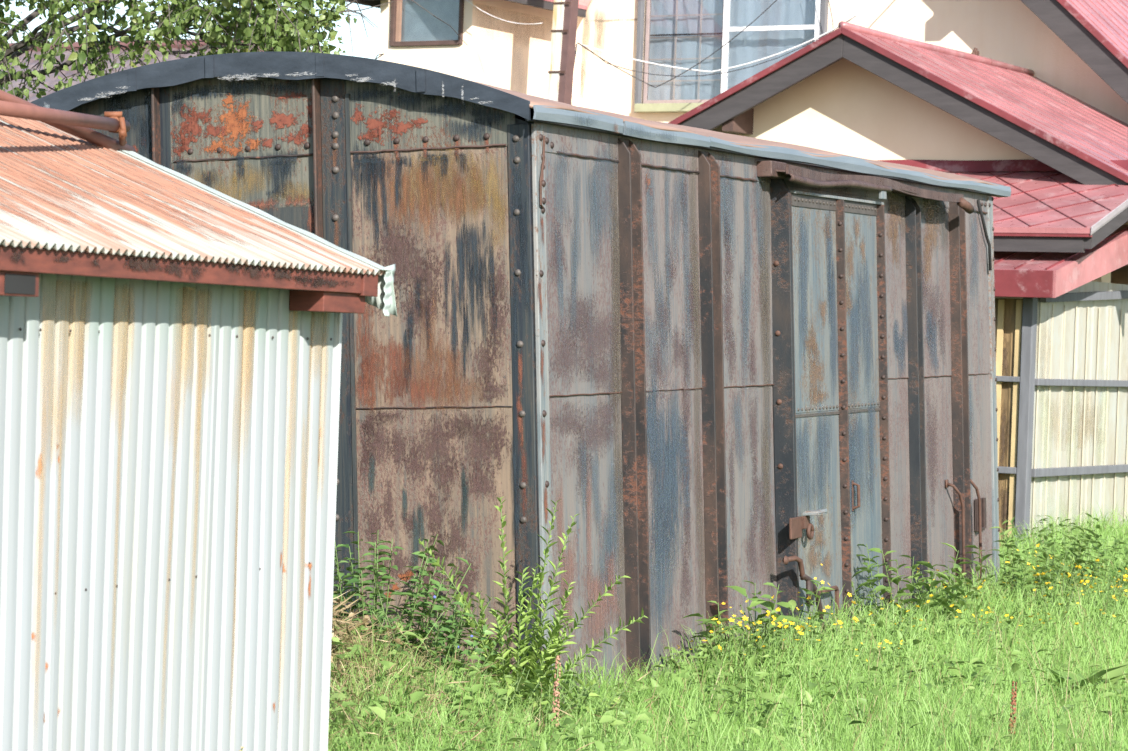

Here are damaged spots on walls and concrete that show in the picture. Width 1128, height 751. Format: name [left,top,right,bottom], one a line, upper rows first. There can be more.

corrosion [0,115,372,266]
corrosion [356,302,439,408]
corrosion [805,302,826,406]
corrosion [544,478,617,638]